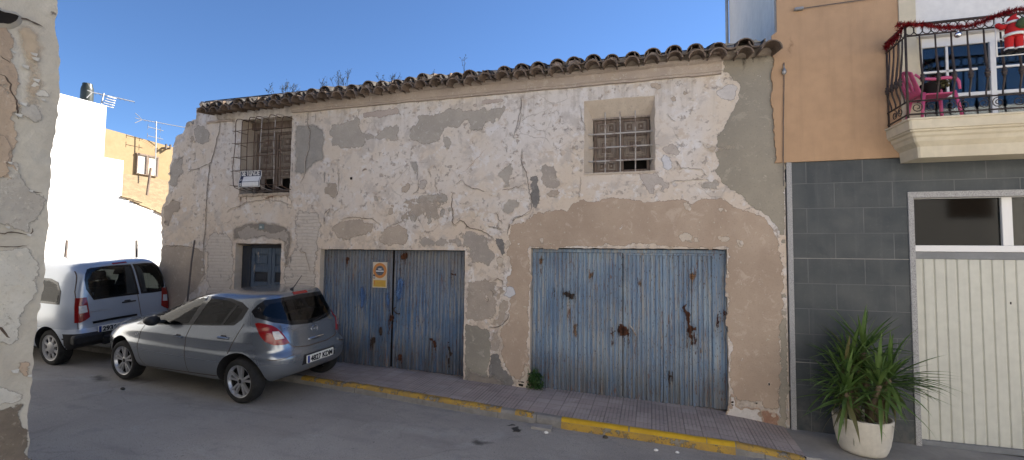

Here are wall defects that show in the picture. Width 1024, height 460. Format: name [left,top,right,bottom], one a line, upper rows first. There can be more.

peeling [0,27,49,345]
crack [166,112,316,285]
crack [409,98,532,240]
flaking render [284,55,790,428]
corrosion [554,289,577,346]
corrosion [610,324,631,346]
corrosion [682,304,701,359]
flaking render [0,387,32,460]